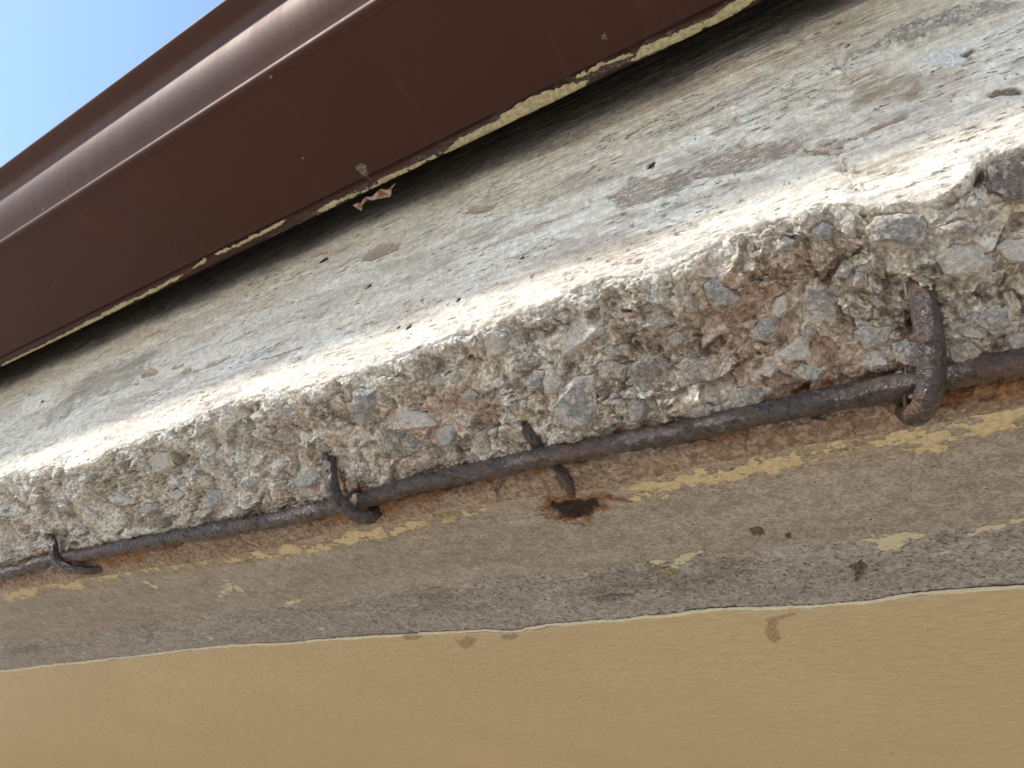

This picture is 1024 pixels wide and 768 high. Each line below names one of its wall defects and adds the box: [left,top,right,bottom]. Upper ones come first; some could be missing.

spalling [0,140,1024,589]
rust [863,363,904,380]
rust [537,494,628,526]